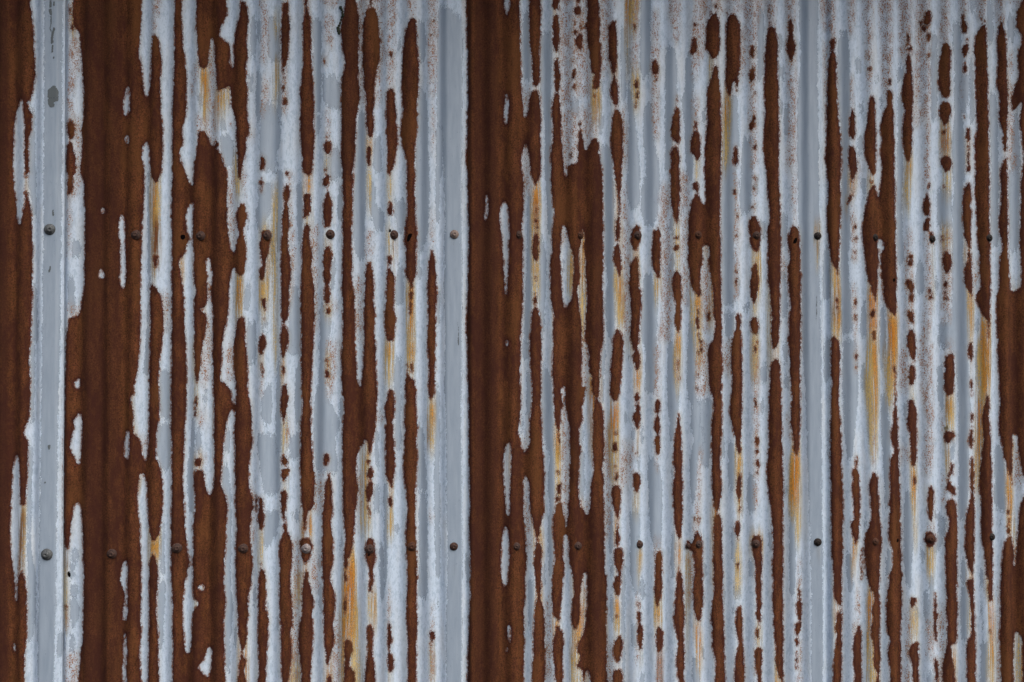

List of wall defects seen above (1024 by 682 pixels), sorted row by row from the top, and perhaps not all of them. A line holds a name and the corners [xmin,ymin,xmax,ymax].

rust [0,0,37,682]
peeling [26,0,80,682]
peeling [143,171,172,473]
peeling [222,429,237,672]
rust [62,0,439,682]
peeling [324,4,470,682]
rust [465,0,803,682]
peeling [600,0,706,402]
peeling [779,0,891,682]
rust [817,0,1024,682]
peeling [885,21,981,588]
peeling [988,90,1021,253]